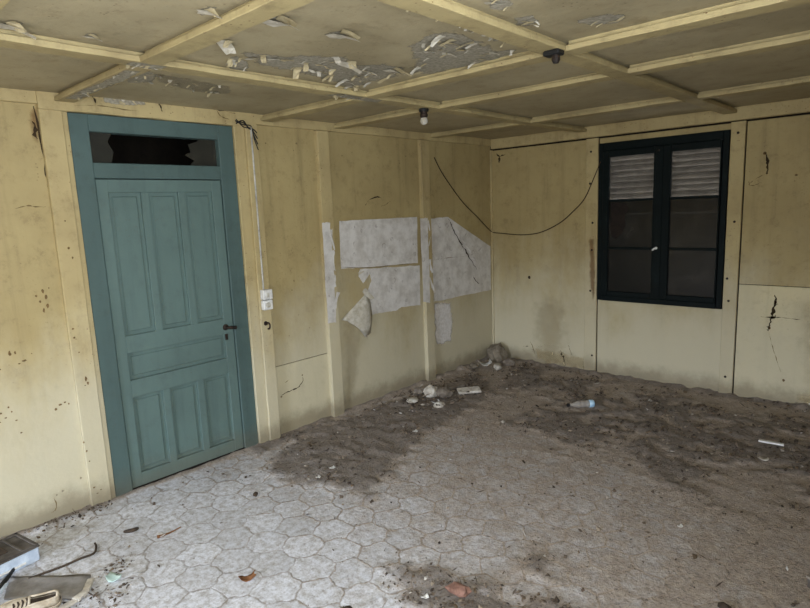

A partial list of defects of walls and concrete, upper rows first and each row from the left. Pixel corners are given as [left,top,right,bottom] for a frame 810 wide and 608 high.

peeling [217,27,516,103]
crack [767,295,800,363]